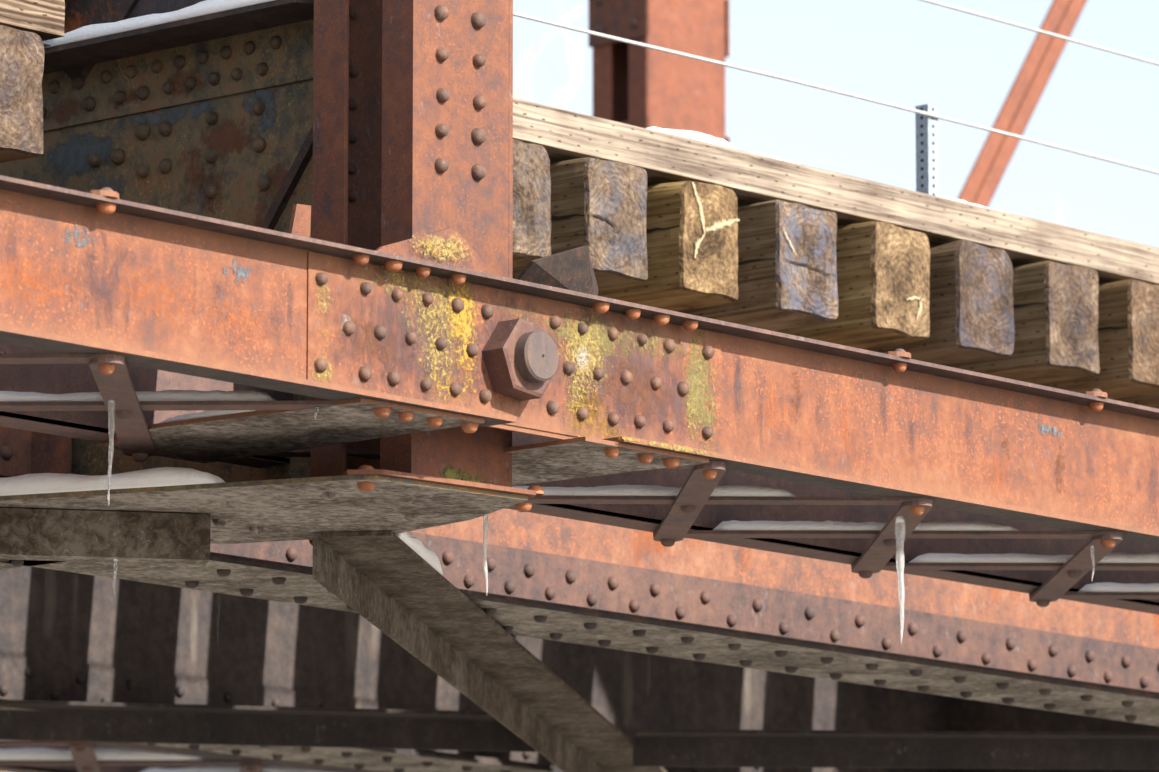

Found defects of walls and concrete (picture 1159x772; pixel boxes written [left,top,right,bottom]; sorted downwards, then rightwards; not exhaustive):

peeling [1038,424,1062,438]